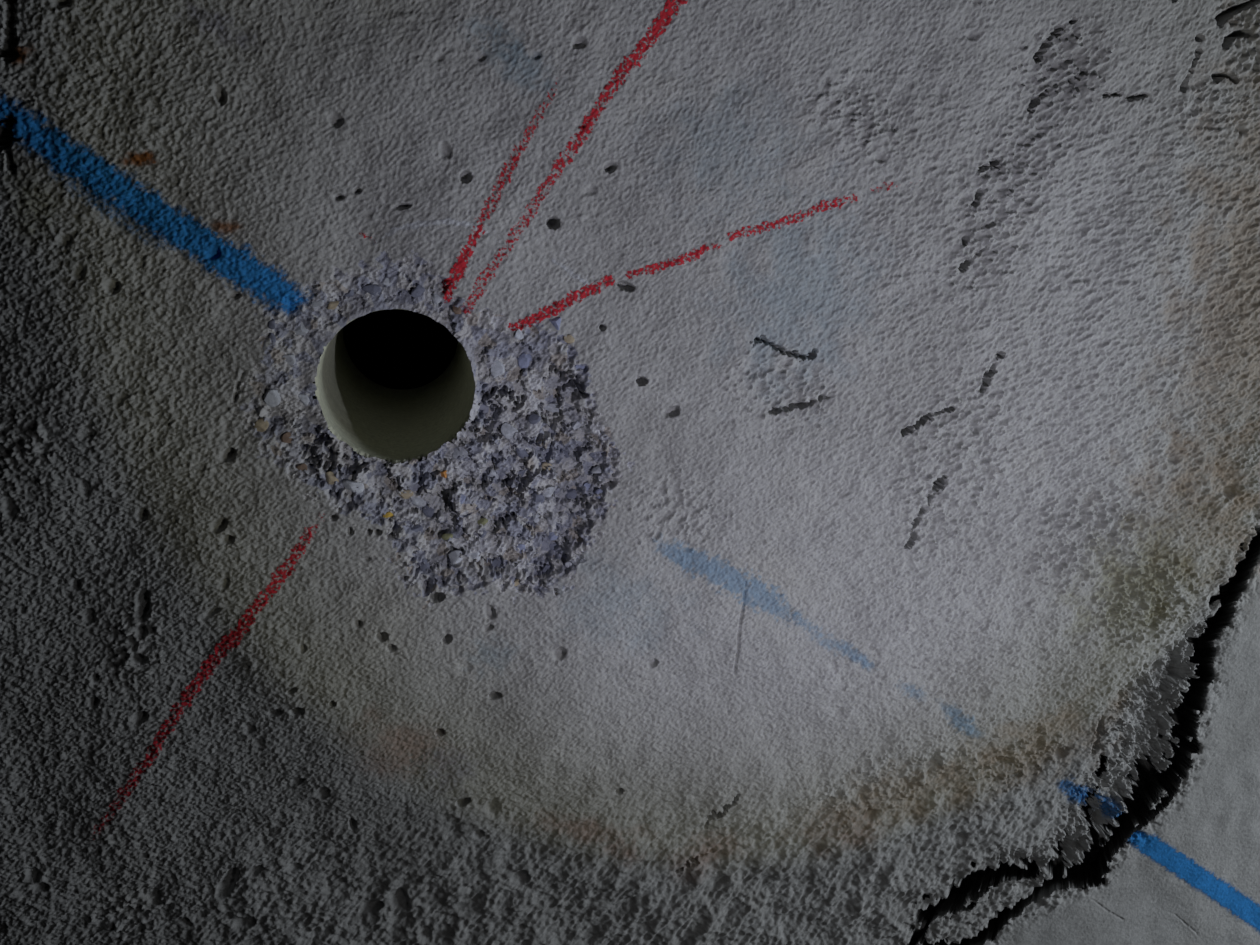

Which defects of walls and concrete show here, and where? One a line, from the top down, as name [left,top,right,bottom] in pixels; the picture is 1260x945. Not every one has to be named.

crack [0,97,53,175]
spalling [239,250,746,610]
crack [732,580,748,676]
crack [907,525,1260,945]